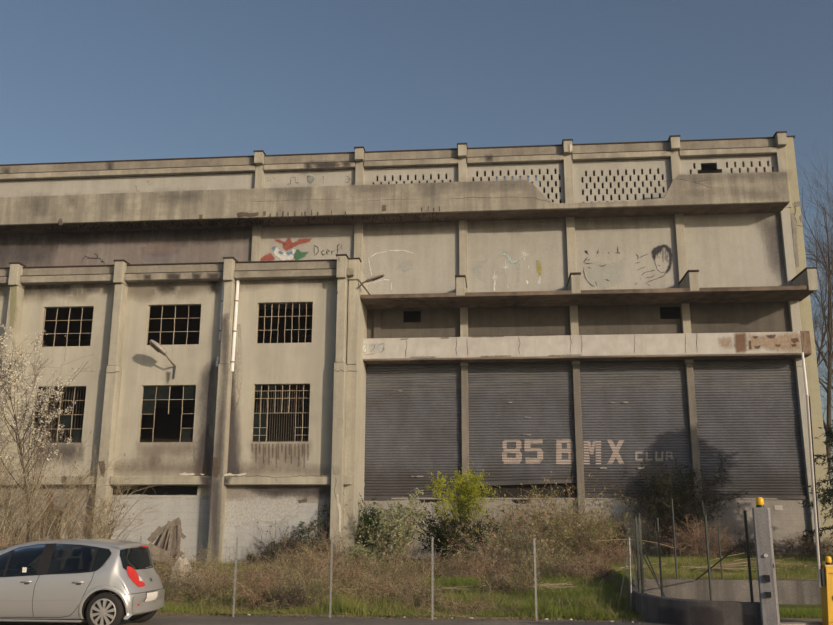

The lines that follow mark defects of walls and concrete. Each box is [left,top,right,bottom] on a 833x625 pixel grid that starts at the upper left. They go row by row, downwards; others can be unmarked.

water stain [766,221,783,268]
water stain [198,318,242,559]